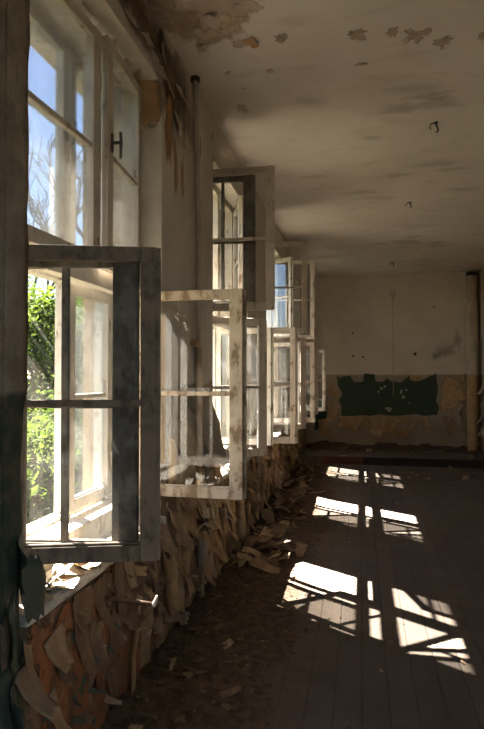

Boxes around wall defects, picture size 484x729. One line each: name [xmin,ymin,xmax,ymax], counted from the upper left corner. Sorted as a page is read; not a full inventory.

water stain [124,0,264,193]
peeling [383,27,453,50]
peeling [0,0,329,729]
peeling [308,373,467,440]